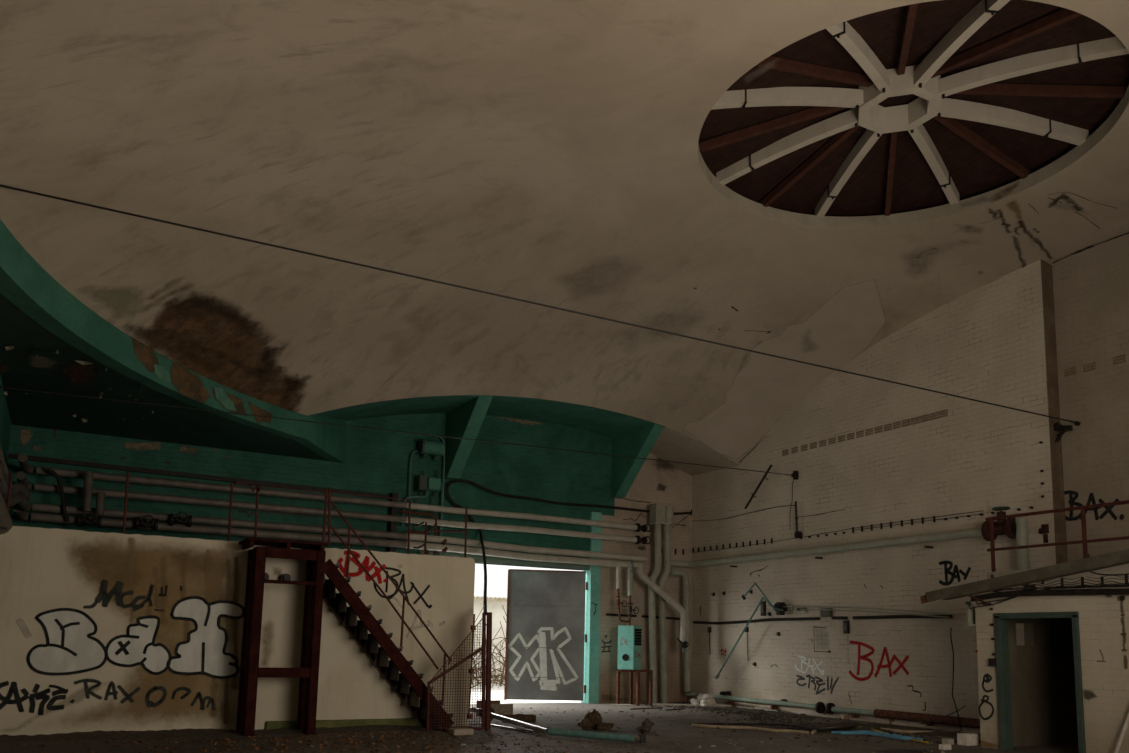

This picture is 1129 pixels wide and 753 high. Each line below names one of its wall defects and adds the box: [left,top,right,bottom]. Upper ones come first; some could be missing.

peeling [131,336,272,423]
water stain [73,538,238,658]
water stain [87,665,237,723]